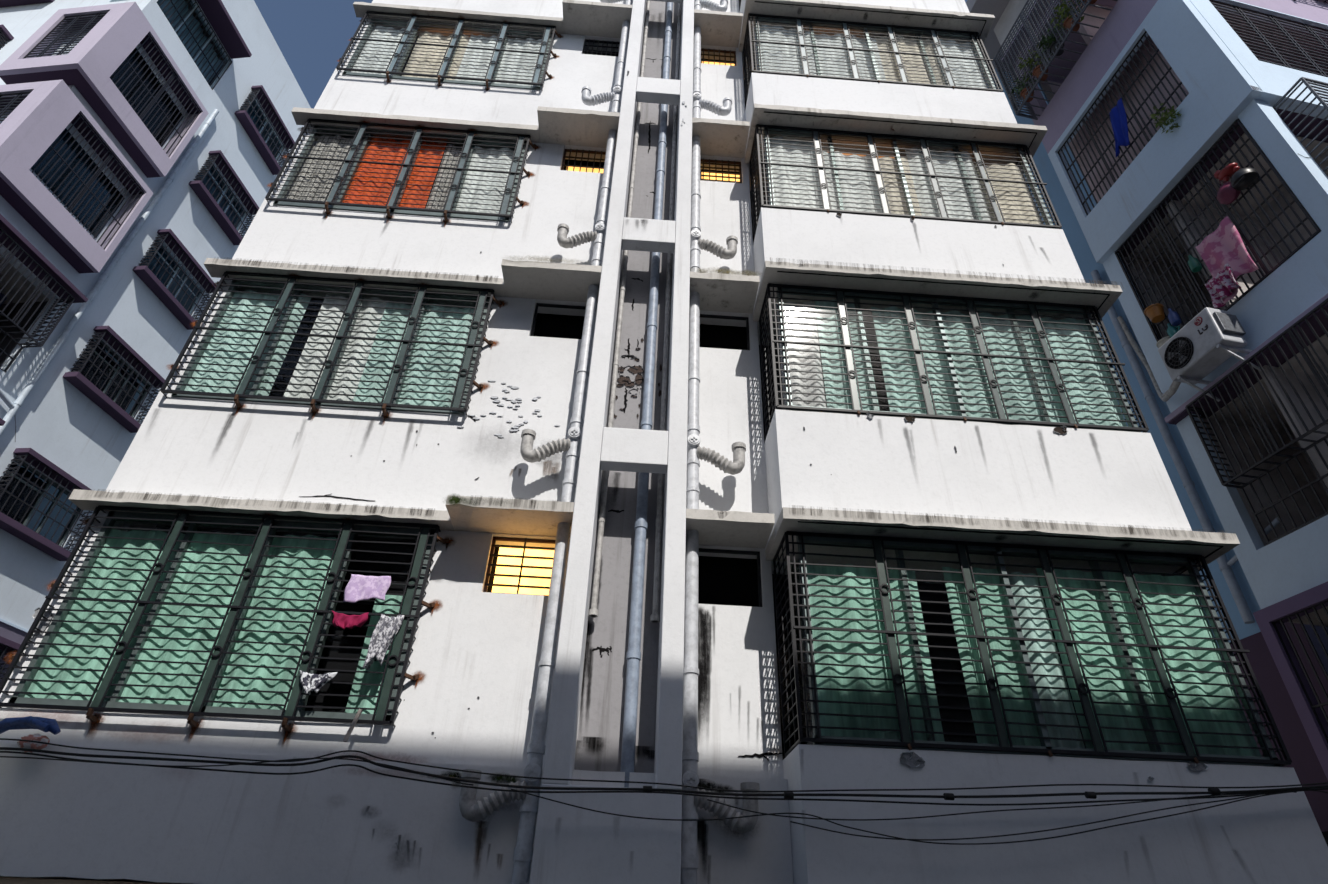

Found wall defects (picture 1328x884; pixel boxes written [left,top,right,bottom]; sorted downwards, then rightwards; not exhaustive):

peeling [457,380,542,438]
damp [581,621,593,711]
damp [698,608,715,712]
damp [586,737,602,752]